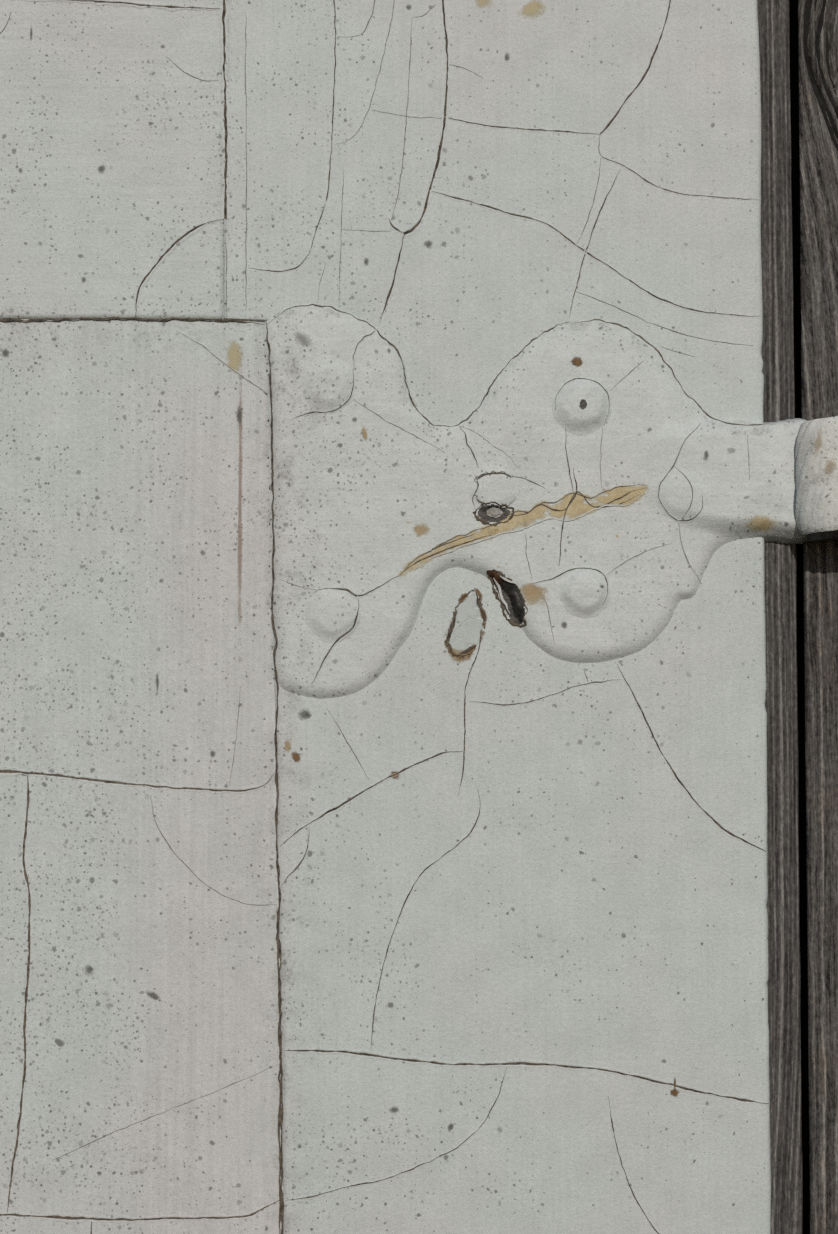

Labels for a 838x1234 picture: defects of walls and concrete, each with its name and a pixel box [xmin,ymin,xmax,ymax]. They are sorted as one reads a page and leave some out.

crack [23,0,231,316]
crack [244,0,762,344]
peeling [400,469,647,575]
crack [0,302,776,1234]